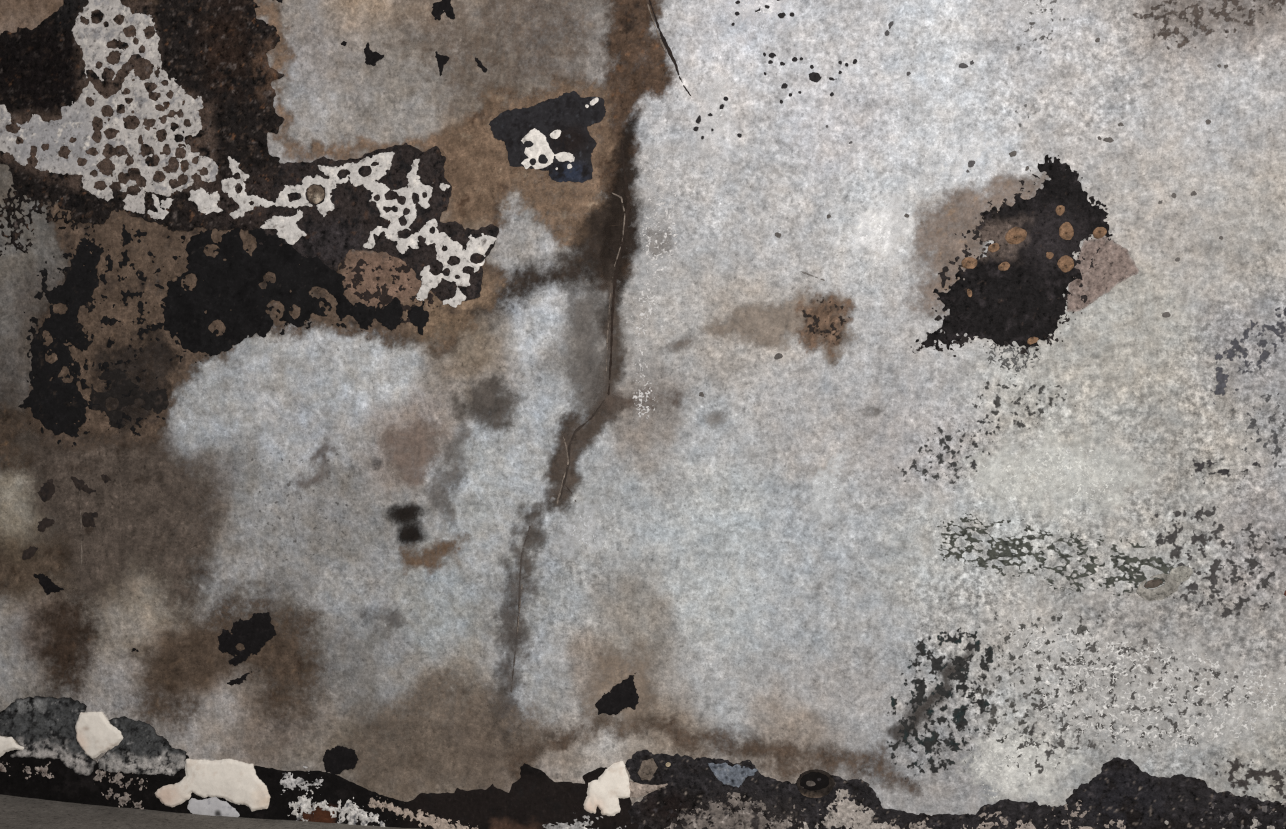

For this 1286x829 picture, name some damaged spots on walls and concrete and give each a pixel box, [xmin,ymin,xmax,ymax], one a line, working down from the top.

crack [648,0,691,96]
peeling [0,0,497,447]
leakage [259,249,507,357]
crack [556,140,630,504]
rust [708,294,853,362]
rust [962,227,1027,271]
rust [1046,205,1074,272]
leakage [0,202,325,723]
crack [511,526,531,692]
peeling [0,696,478,829]
spalling [542,758,671,829]
leakage [887,611,1286,801]